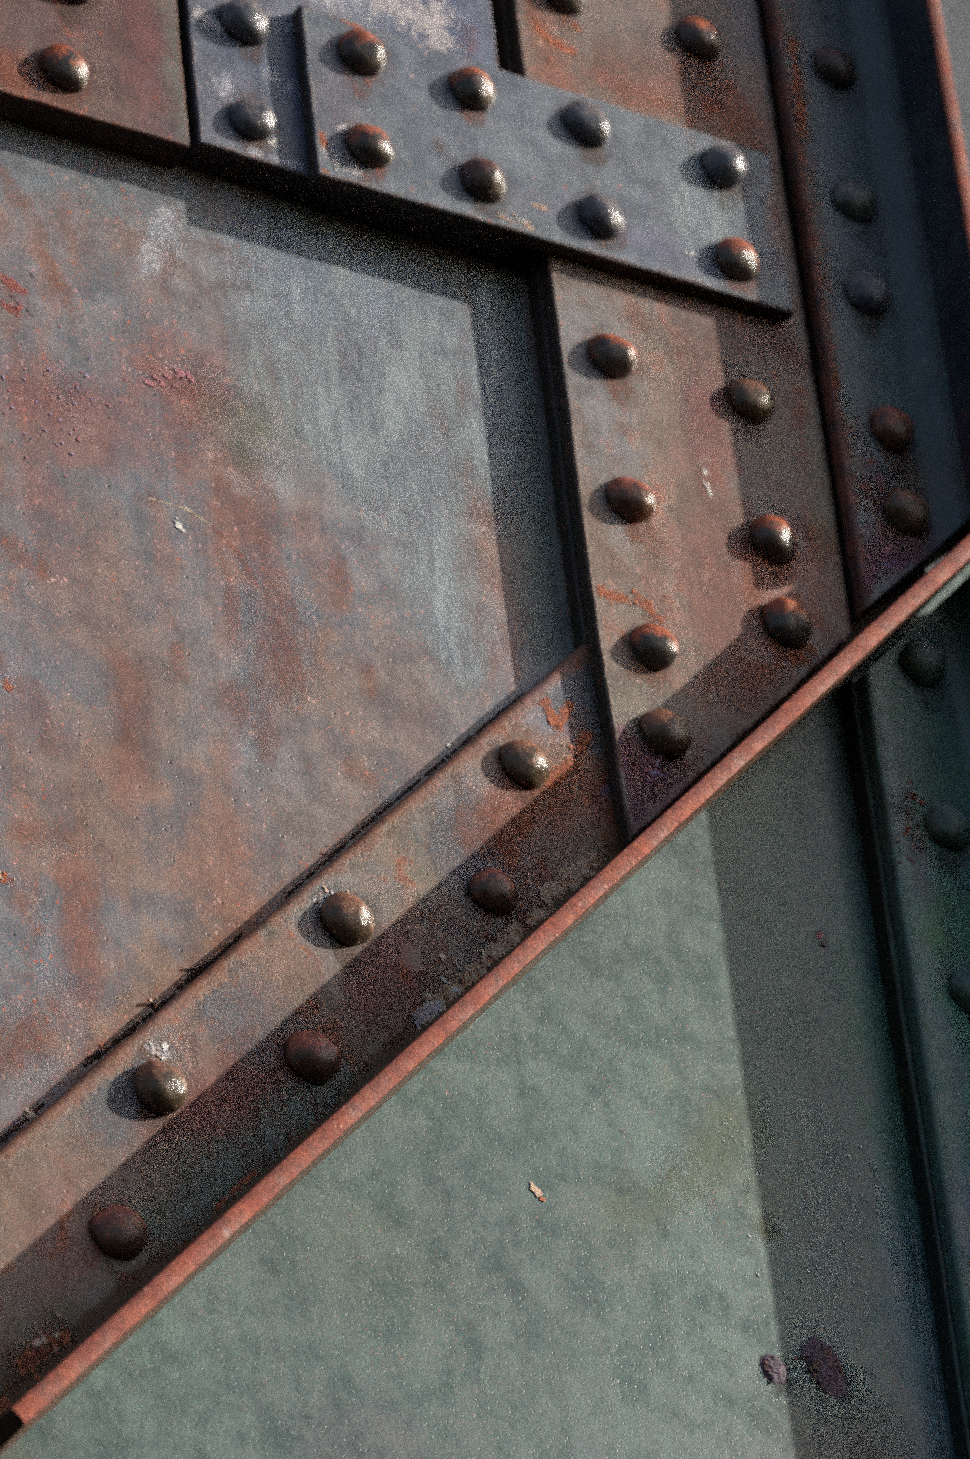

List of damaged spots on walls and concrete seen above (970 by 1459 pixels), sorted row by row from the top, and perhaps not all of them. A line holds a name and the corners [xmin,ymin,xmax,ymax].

peeling [0,273,34,316]
rust [596,584,667,625]
rust [539,695,595,806]
peeling [411,848,608,1030]